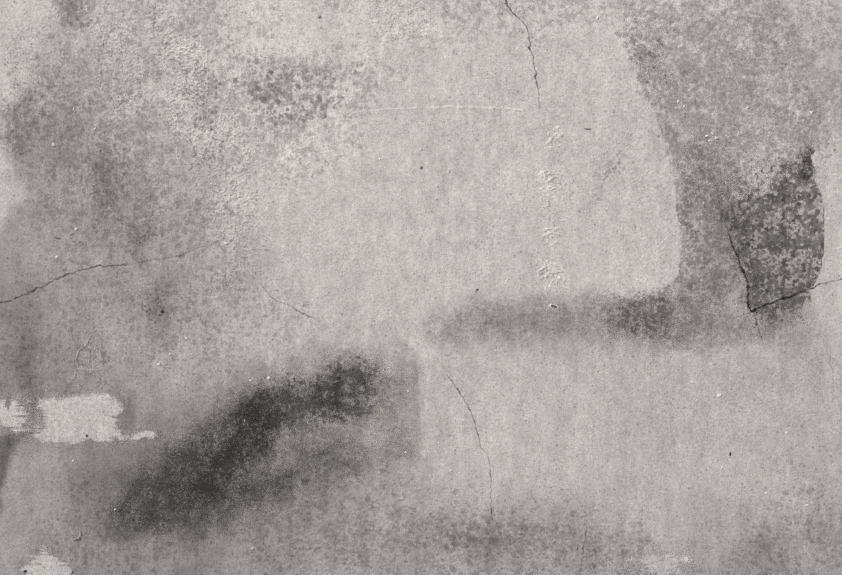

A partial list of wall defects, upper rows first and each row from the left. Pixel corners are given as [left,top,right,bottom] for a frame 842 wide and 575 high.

leakage [722,154,824,316]
crack [726,226,842,325]
peeling [0,335,158,447]
leakage [118,369,366,536]